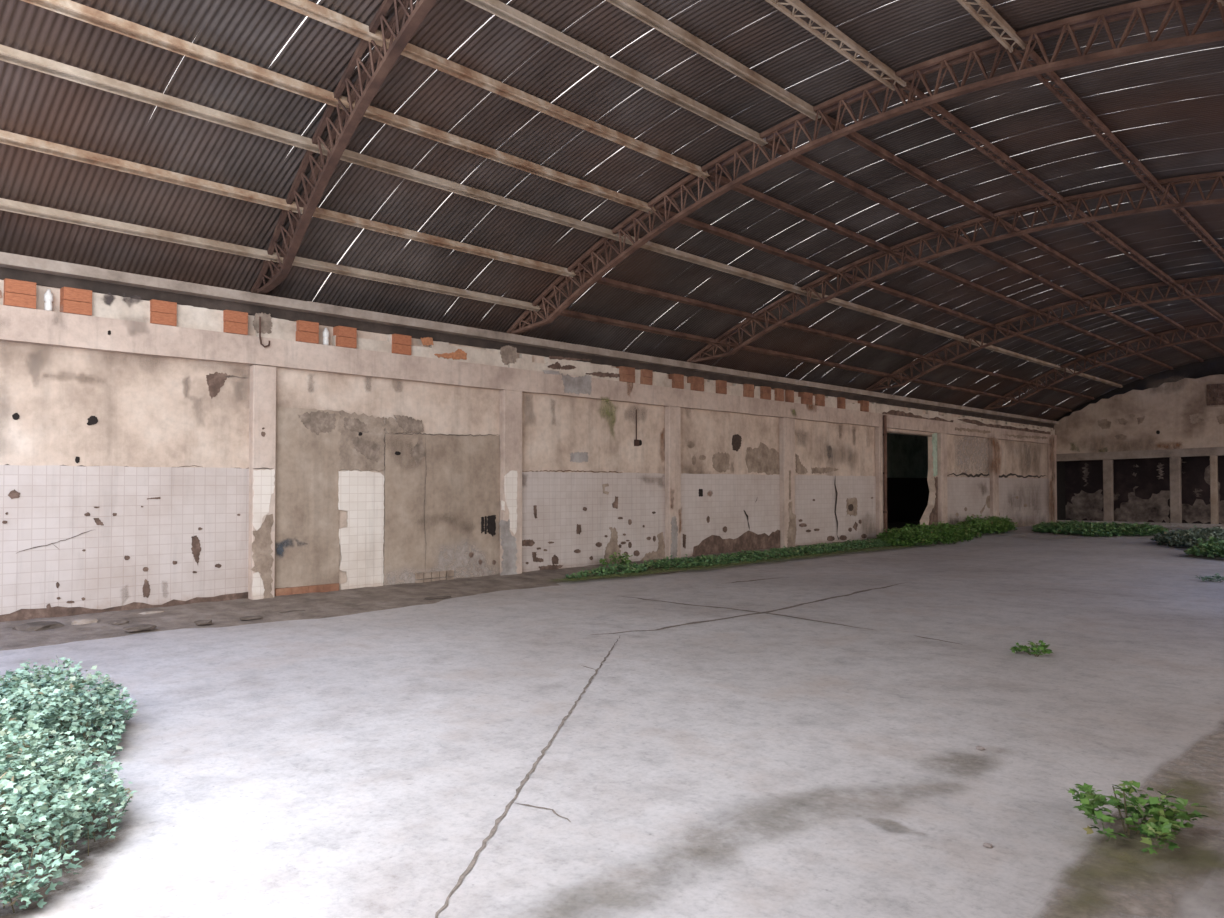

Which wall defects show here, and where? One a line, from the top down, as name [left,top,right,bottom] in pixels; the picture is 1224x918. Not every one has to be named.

spalling [206,372,246,399]
flaking render [298,411,426,466]
peeling [0,514,274,622]
spalling [469,501,563,575]
peeling [574,434,867,564]
crack [833,476,841,539]
peeling [1066,459,1224,524]
crack [435,578,908,918]